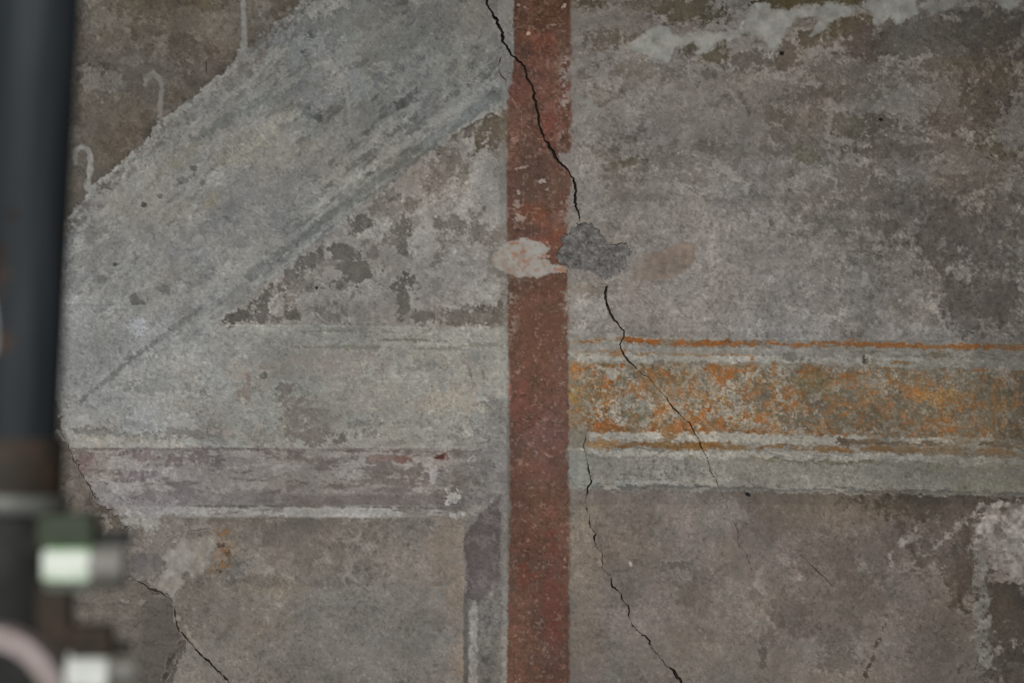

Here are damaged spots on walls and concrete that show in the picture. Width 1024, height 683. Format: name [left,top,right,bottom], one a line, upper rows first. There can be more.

crack [484,0,582,221]
spalling [492,216,697,284]
crack [576,284,754,683]
crack [180,624,231,683]
water stain [887,497,1024,671]